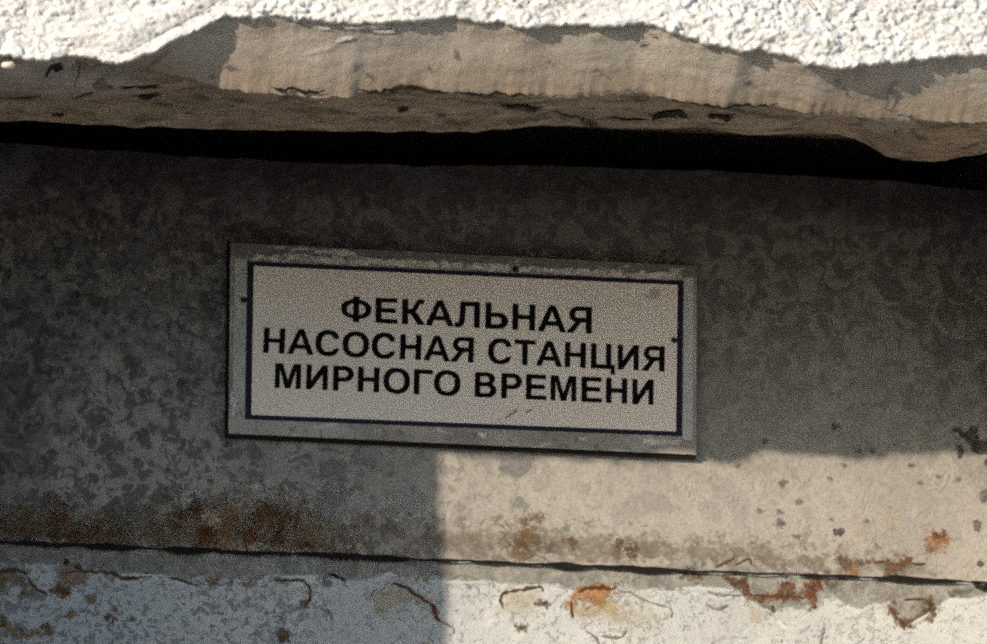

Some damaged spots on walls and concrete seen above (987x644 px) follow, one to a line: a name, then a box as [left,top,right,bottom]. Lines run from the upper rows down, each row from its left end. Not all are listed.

spalling [121,16,987,124]
corrosion [0,488,358,605]
corrosion [277,614,291,643]
corrosion [501,511,578,568]
corrosion [564,582,619,618]
corrosion [722,529,957,616]
corrosion [888,595,937,630]